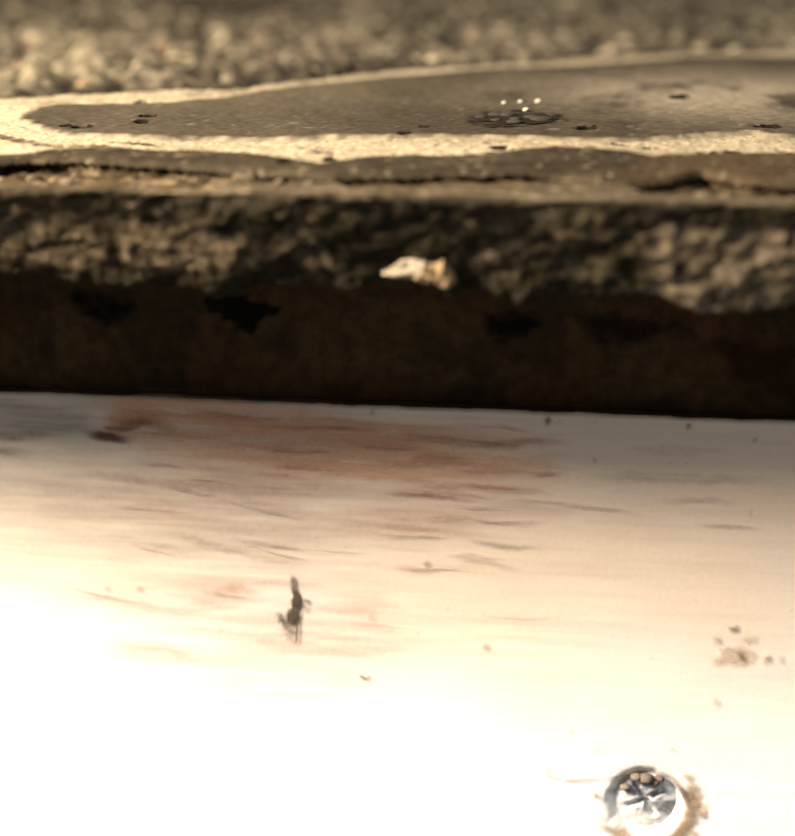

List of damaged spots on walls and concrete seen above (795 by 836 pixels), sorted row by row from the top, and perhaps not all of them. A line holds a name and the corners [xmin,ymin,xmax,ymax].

spalling [0,164,234,191]
spalling [338,176,547,188]
spalling [634,175,795,199]